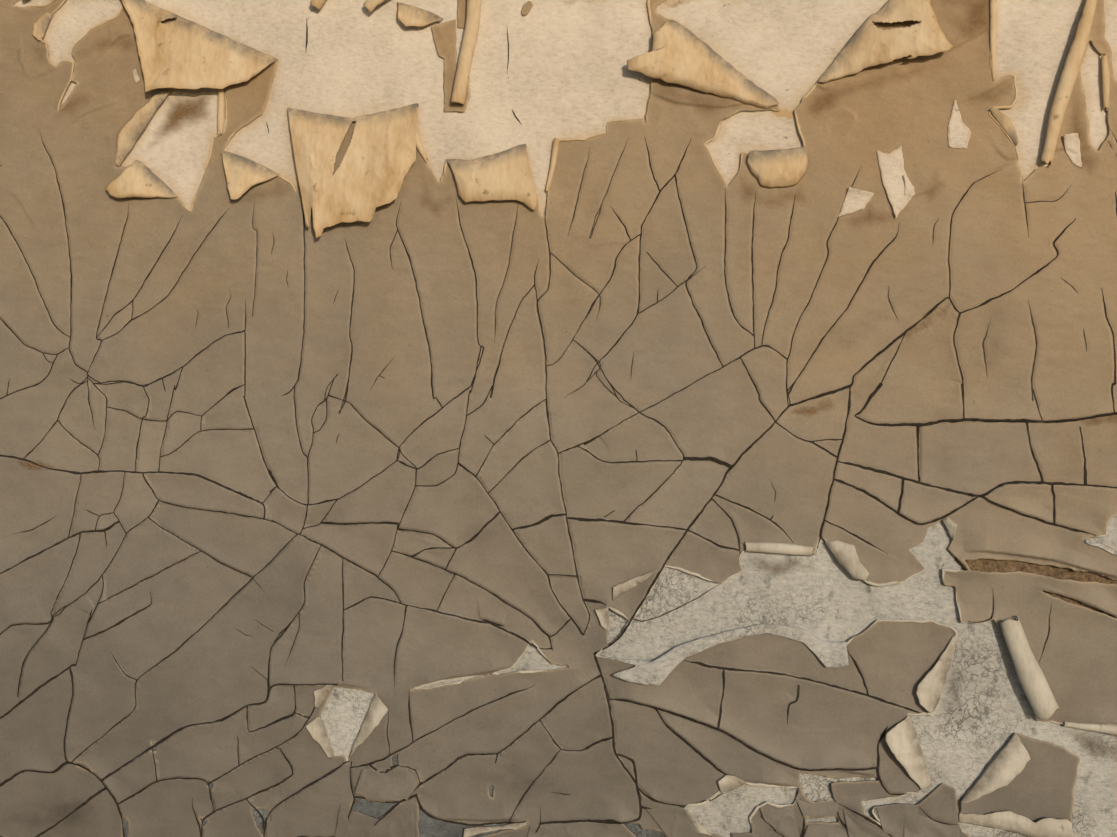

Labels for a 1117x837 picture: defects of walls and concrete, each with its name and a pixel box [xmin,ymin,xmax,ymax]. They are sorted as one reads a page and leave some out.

peeling [13,0,953,238]
peeling [948,100,971,149]
peeling [988,0,1117,181]
crack [39,130,72,309]
crack [348,137,1117,837]
peeling [306,685,388,761]
peeling [411,640,569,690]
peeling [595,515,1117,837]